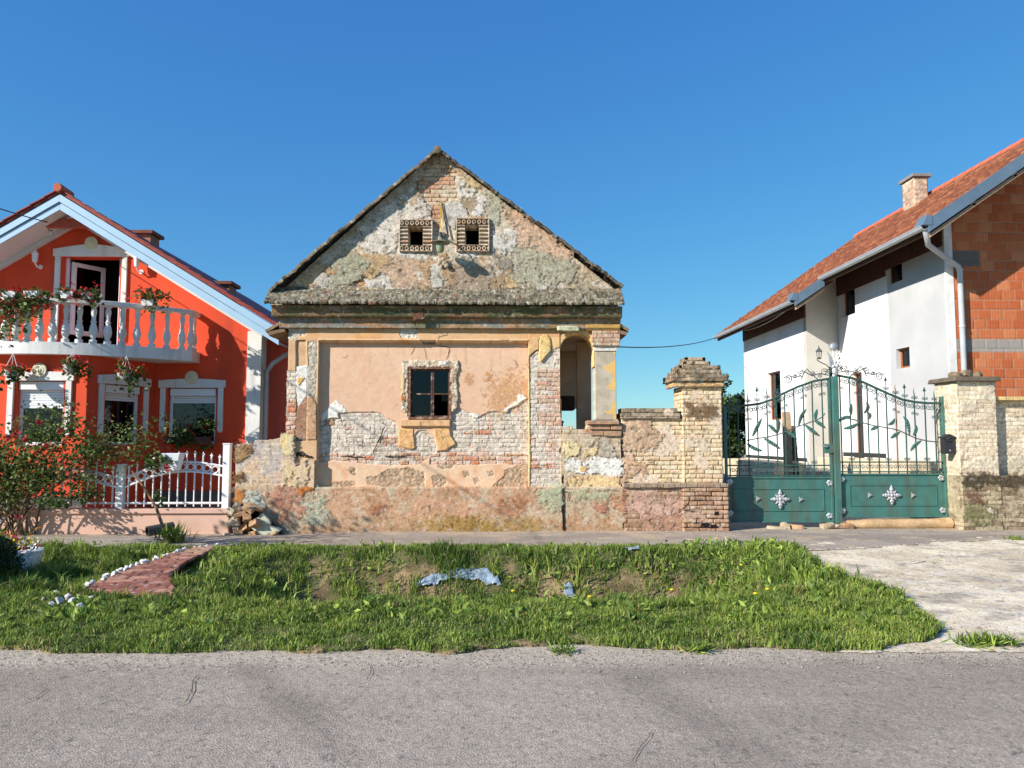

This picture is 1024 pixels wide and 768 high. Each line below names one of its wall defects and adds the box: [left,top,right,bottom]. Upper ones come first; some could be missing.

peeling [298,159,577,291]
spalling [280,329,624,487]